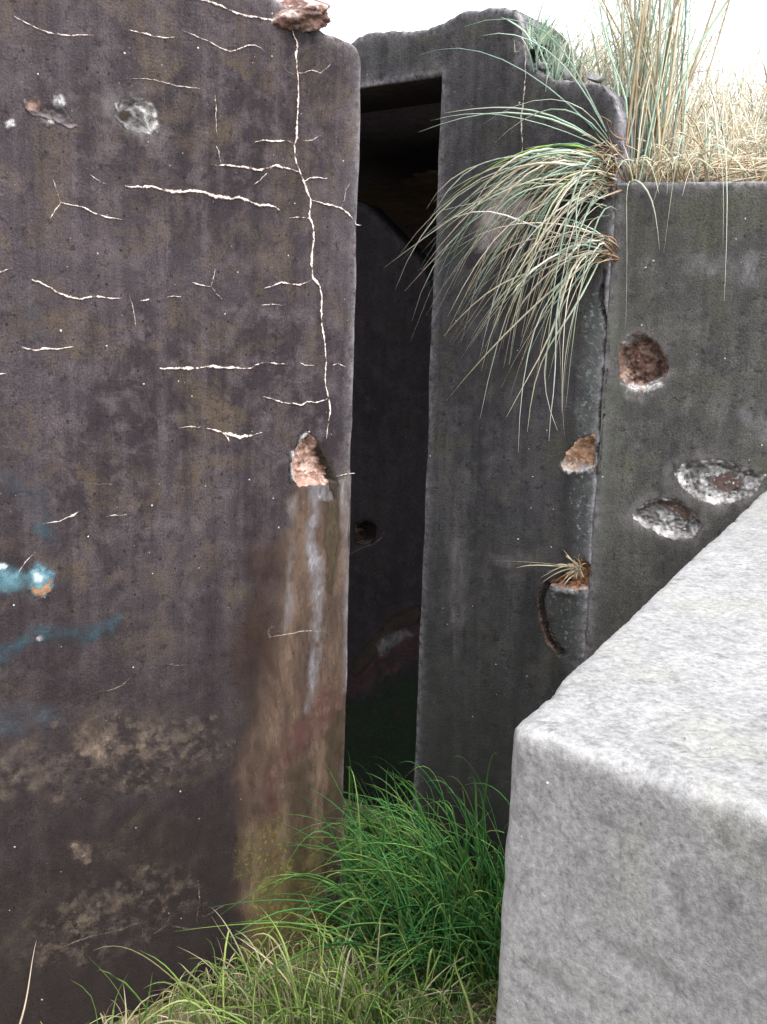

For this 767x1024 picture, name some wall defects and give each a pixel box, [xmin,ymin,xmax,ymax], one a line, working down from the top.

crack [14,16,93,36]
spalling [23,95,78,128]
spalling [114,97,158,134]
crack [50,180,122,220]
crack [91,0,360,441]
crack [0,268,222,325]
crack [22,344,73,352]
spalling [618,333,669,392]
spalling [291,433,339,497]
spalling [561,434,596,474]
spalling [632,459,766,541]